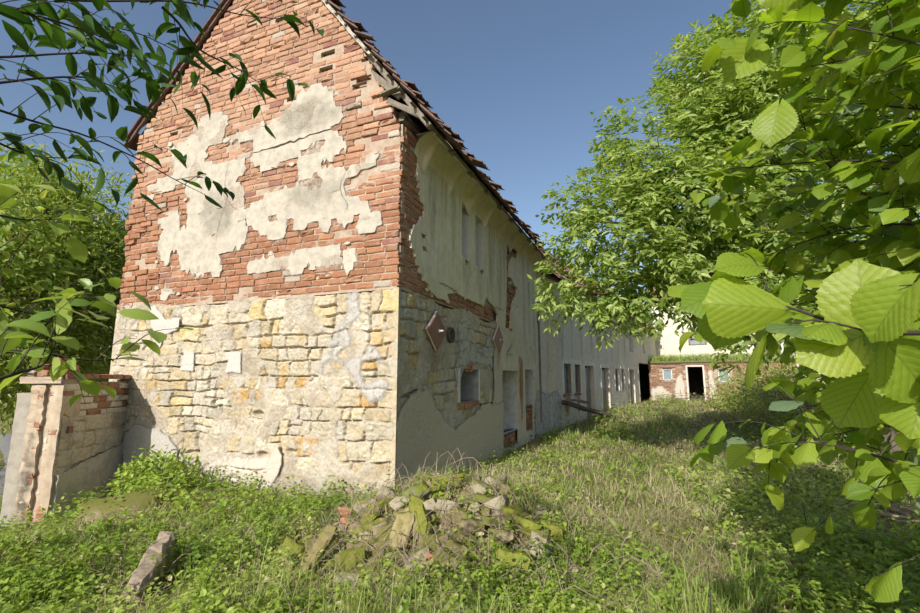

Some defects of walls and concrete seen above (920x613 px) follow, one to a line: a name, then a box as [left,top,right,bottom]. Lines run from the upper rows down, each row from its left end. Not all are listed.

peeling [147,83,384,279]
peeling [150,283,181,348]
spalling [505,244,518,331]
peeling [180,350,194,371]
peeling [225,352,241,373]
peeling [253,446,282,493]